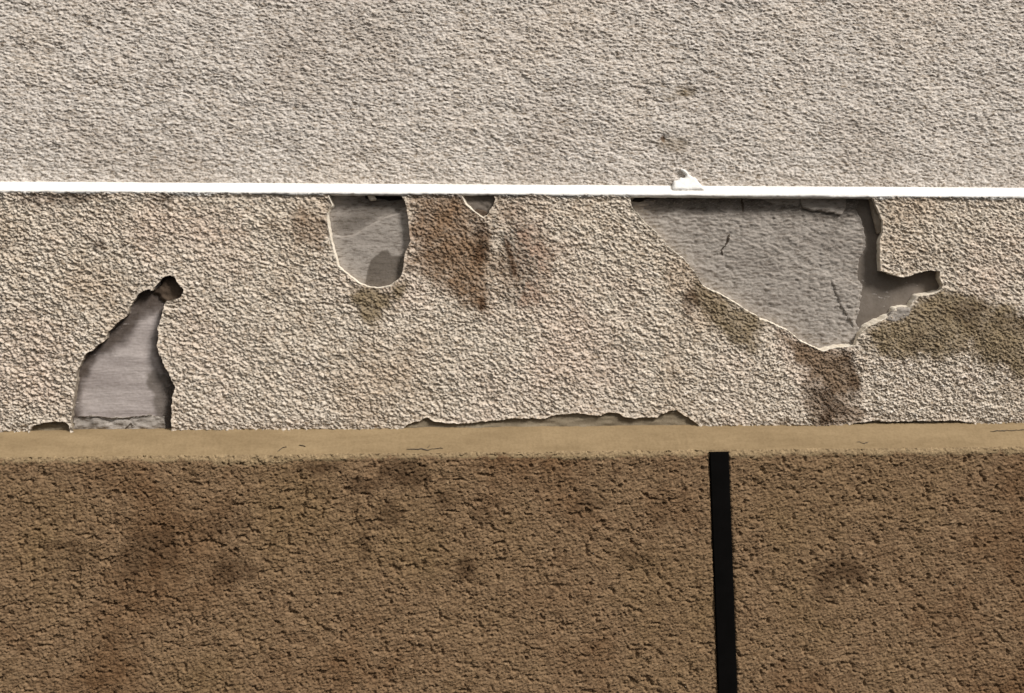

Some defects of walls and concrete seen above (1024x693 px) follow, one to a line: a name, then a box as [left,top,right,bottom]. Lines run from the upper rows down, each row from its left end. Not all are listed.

spalling [327,194,411,288]
leakage [409,196,487,309]
spalling [460,189,495,218]
spalling [629,196,943,352]
spalling [31,275,183,430]
spalling [404,410,699,428]
leakage [788,341,859,424]